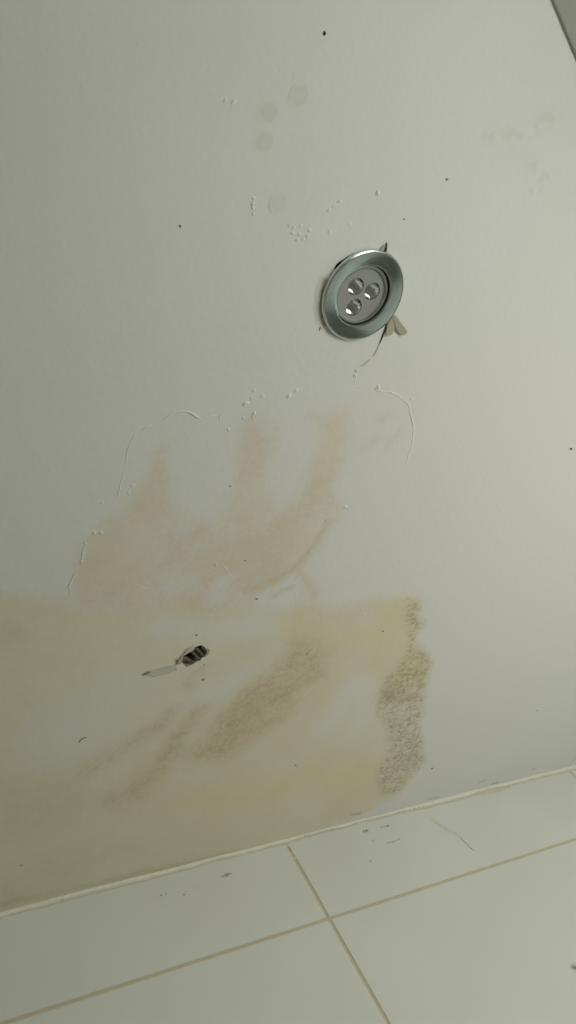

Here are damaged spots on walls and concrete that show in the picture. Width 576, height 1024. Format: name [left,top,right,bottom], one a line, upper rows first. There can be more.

crack [360,324,387,367]
spalling [142,645,210,677]
leakage [0,398,437,912]